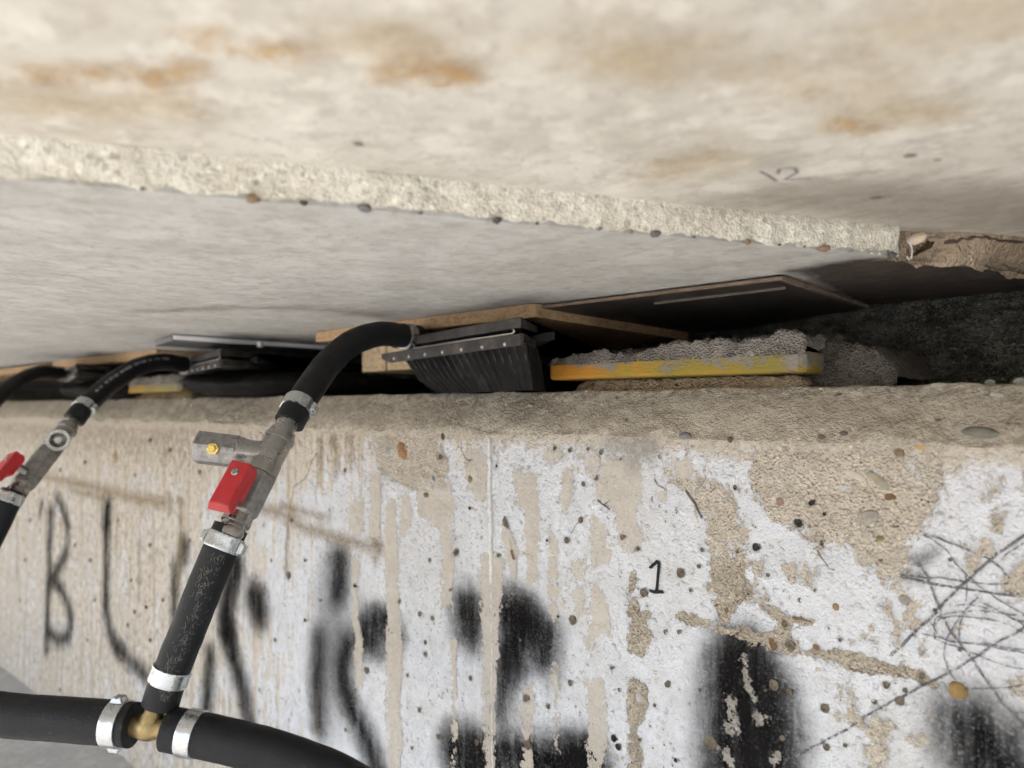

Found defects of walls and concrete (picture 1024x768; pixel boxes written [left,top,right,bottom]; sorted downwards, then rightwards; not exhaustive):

spalling [908,239,935,256]
peeling [465,447,498,510]
peeling [345,430,457,768]
peeling [477,448,649,768]
spalling [626,570,654,658]
spalling [657,432,969,768]
peeling [448,638,459,768]